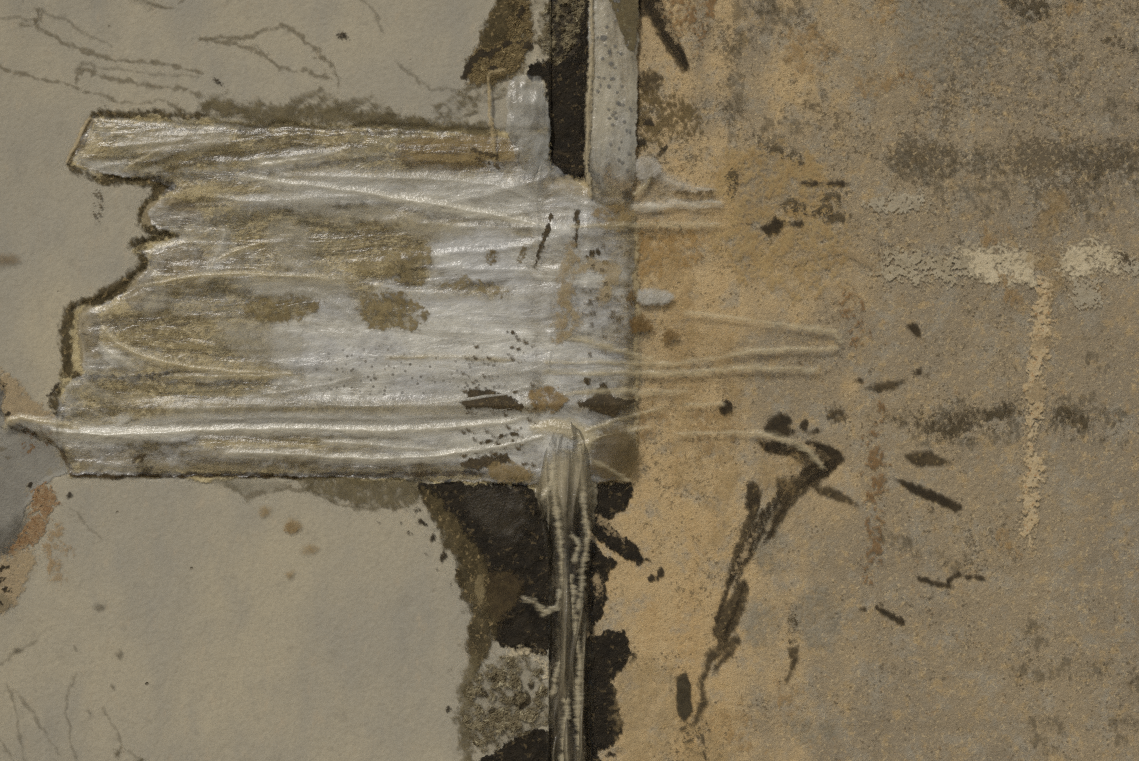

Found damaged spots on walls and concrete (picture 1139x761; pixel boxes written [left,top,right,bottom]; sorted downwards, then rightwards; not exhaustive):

water stain [635,80,705,158]
water stain [861,189,936,218]
peeling [0,105,556,549]
water stain [794,235,1139,557]
peeling [474,575,486,607]
water stain [693,502,771,724]
water stain [446,654,479,761]